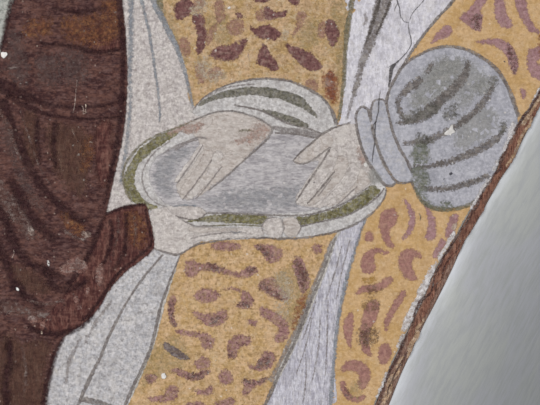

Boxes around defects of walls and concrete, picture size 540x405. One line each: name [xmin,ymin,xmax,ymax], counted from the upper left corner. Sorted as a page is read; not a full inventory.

crack [372,0,424,161]
spalling [375,88,540,405]